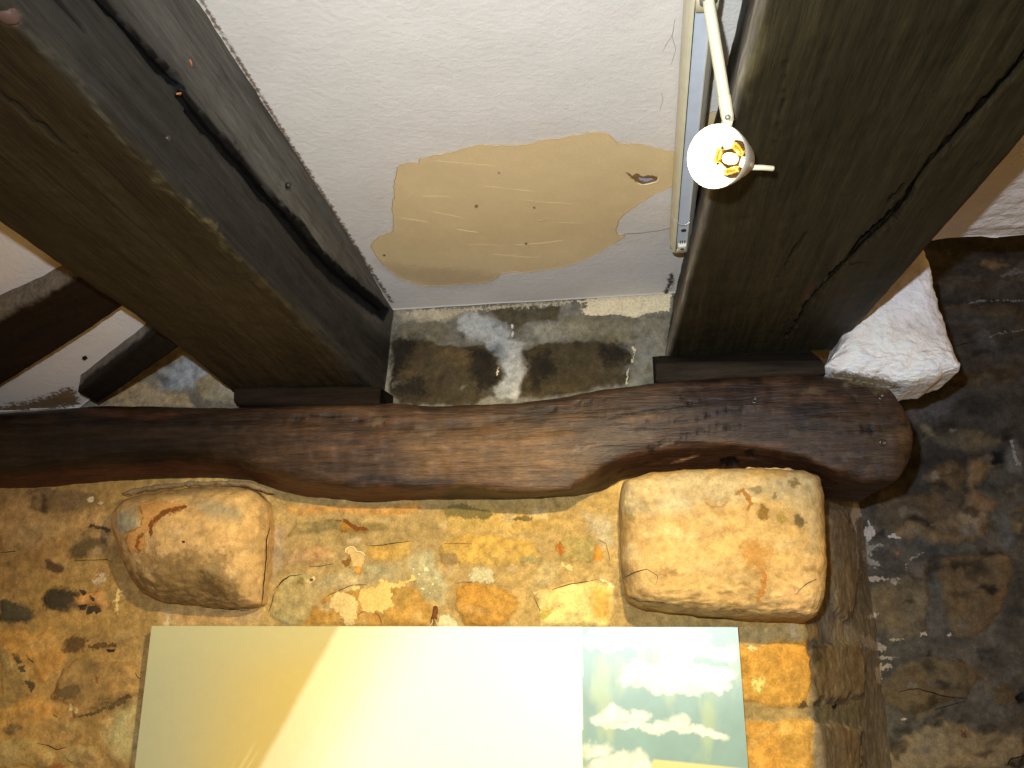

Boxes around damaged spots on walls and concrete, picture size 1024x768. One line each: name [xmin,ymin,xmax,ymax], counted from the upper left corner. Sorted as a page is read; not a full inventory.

peeling [371,132,674,286]
damp [398,299,578,323]
rust [125,500,187,553]